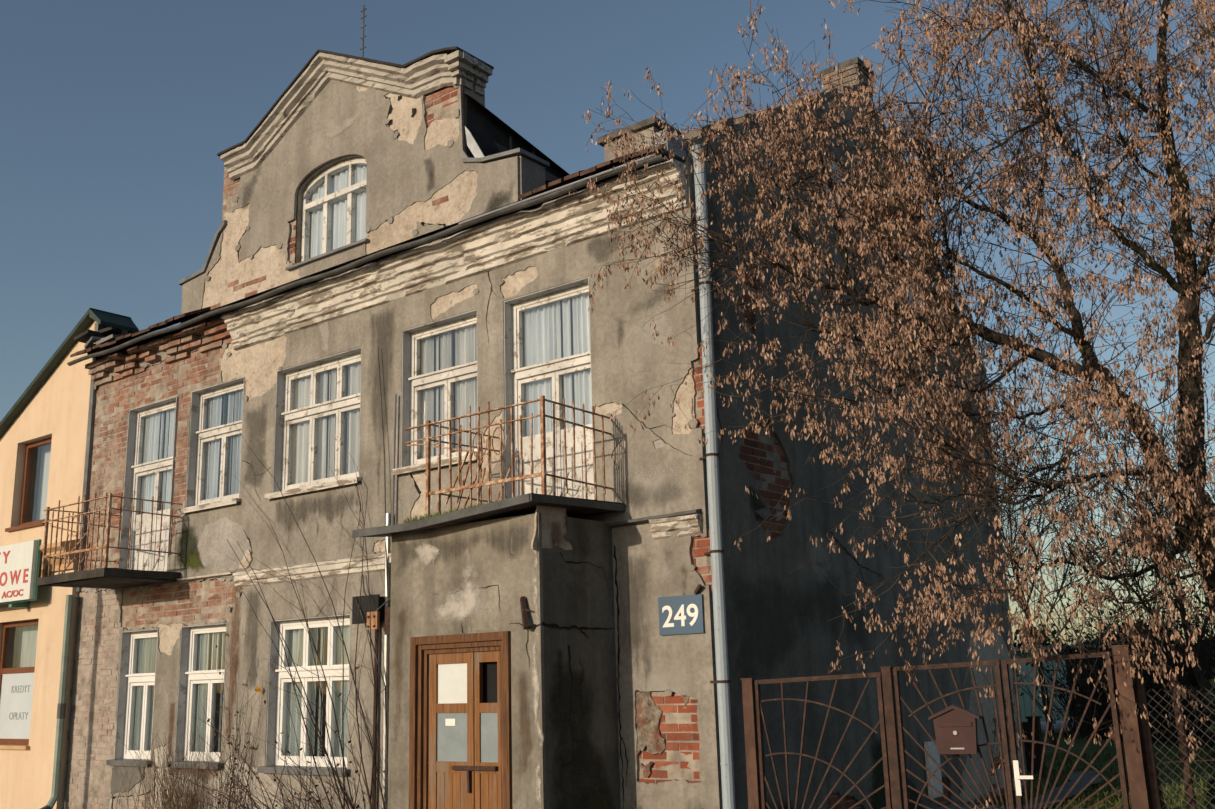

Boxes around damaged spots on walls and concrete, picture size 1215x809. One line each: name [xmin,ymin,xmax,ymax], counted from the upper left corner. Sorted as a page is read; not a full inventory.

peeling [383,85,465,150]
peeling [196,167,300,325]
peeling [366,170,478,257]
peeling [496,267,538,298]
flaking render [86,333,289,570]
crack [622,403,692,456]
spalling [653,349,721,452]
flaking render [739,414,792,540]
flaking render [62,577,288,809]
crack [437,545,628,807]
leakage [551,652,611,809]
flaking render [635,689,701,784]